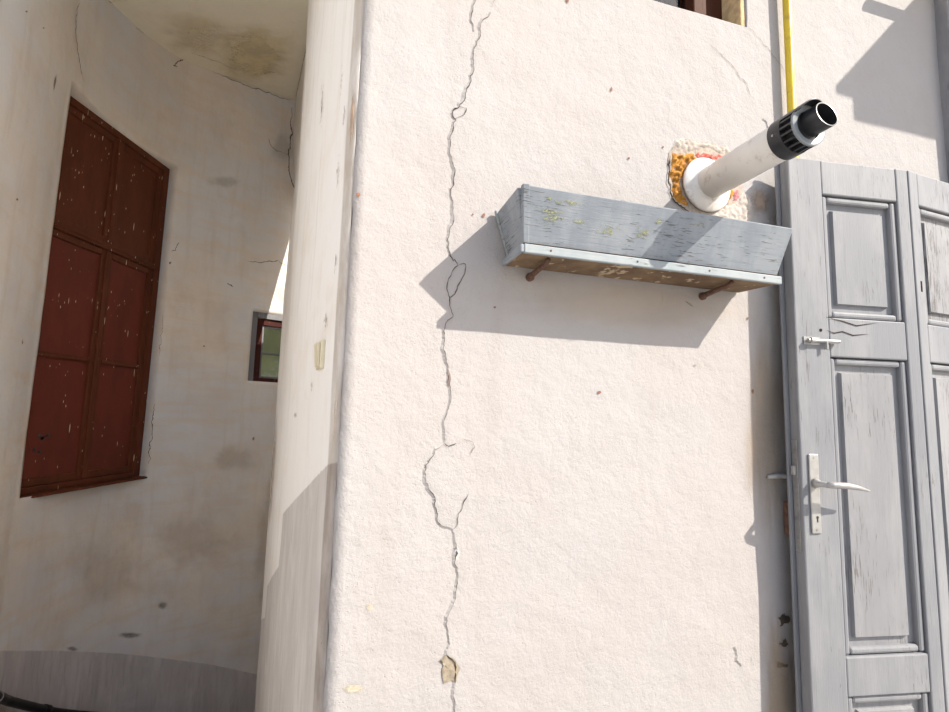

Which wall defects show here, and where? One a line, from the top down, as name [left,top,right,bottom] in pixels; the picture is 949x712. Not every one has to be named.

crack [173,53,305,187]
crack [422,0,495,655]
spalling [439,655,460,683]
crack [448,682,456,712]